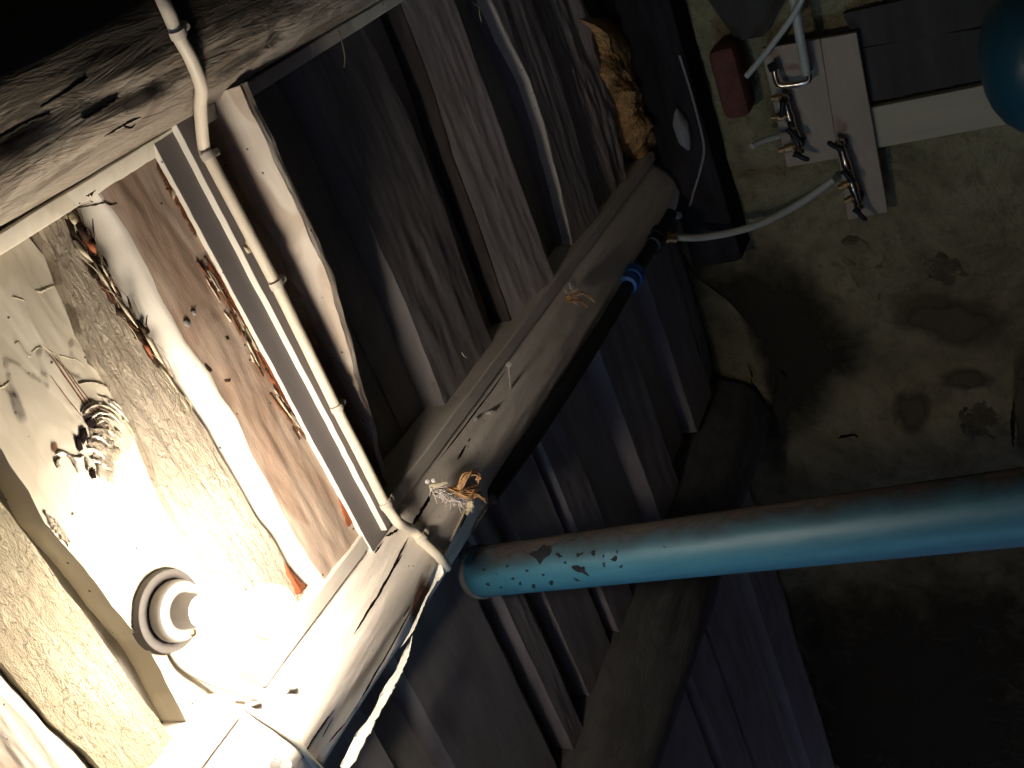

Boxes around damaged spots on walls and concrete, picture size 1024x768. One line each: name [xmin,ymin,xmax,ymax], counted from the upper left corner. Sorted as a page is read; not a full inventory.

crack [354,492,437,634]
peeling [529,544,562,564]
peeling [569,540,617,581]